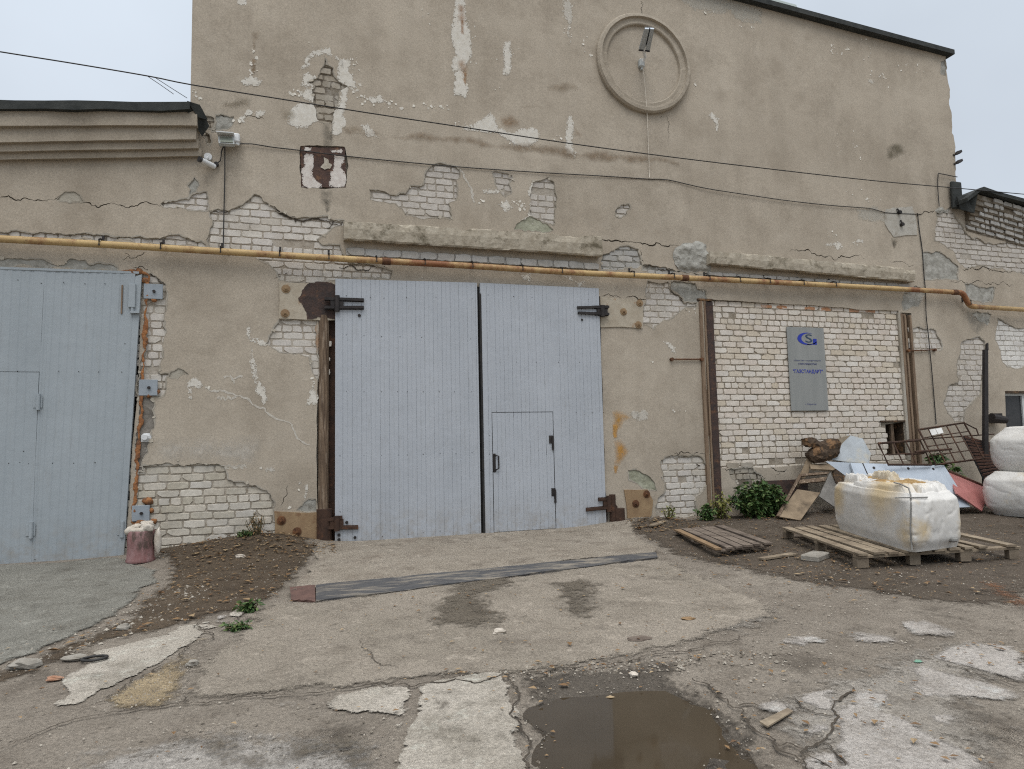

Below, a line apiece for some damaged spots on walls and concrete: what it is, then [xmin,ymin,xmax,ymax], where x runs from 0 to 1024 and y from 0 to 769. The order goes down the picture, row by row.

peeling [287,0,477,135]
spalling [0,177,393,283]
peeling [301,147,347,188]
spalling [369,162,462,220]
spalling [478,170,558,233]
corrosion [298,281,335,319]
spalling [564,245,709,330]
spalling [125,270,317,554]
spalling [246,319,332,405]
spalling [943,318,1024,422]
spalling [627,454,707,518]